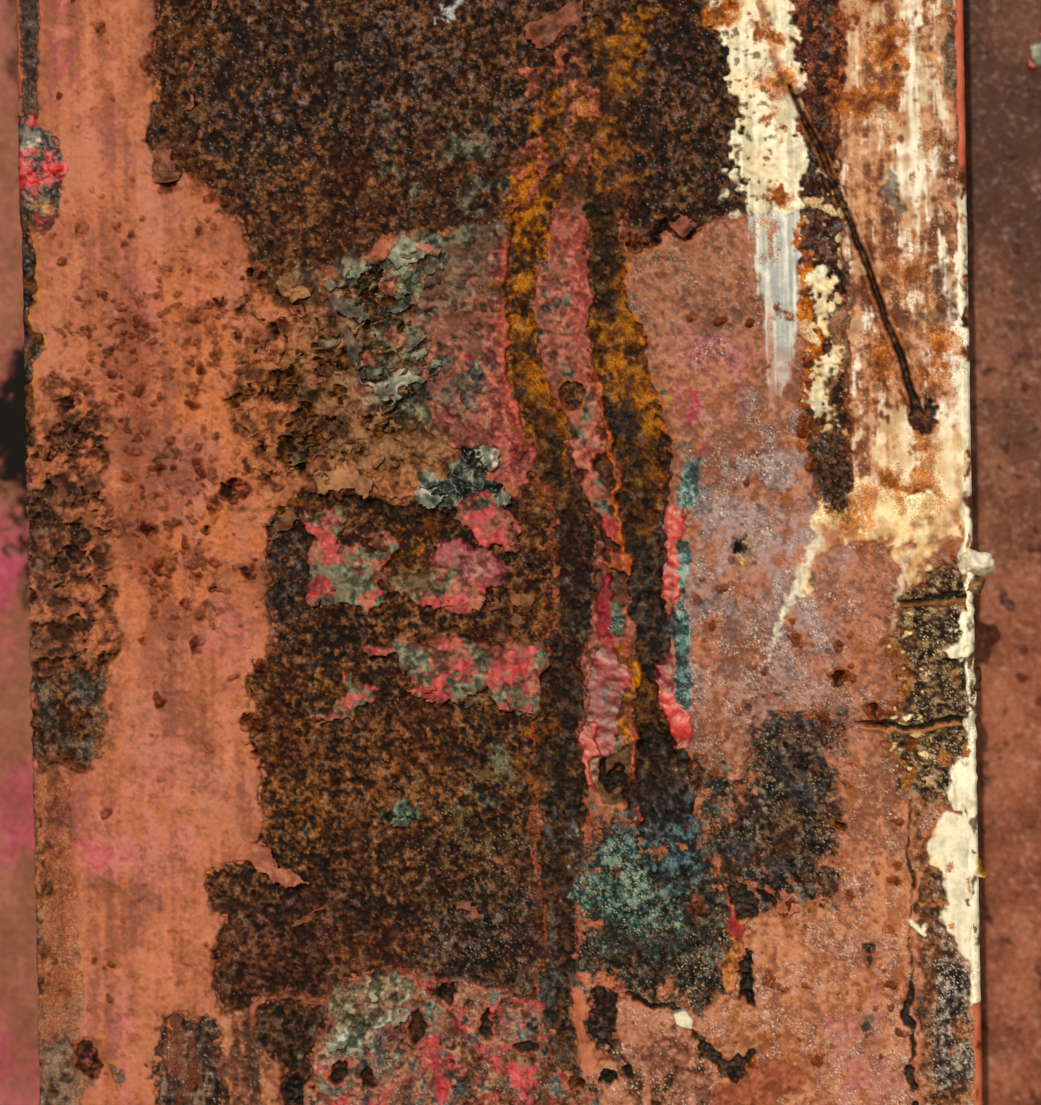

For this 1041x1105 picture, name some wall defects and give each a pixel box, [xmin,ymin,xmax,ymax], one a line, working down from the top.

corrosion [1004,66,1041,139]
corrosion [137,0,956,536]
corrosion [867,318,970,401]
corrosion [166,583,230,655]
peeling [253,175,850,1105]
corrosion [205,472,560,1017]
corrosion [815,705,833,728]
crack [854,715,976,732]
corrosion [831,817,849,831]
spalling [880,556,977,1105]
crack [900,800,920,1105]